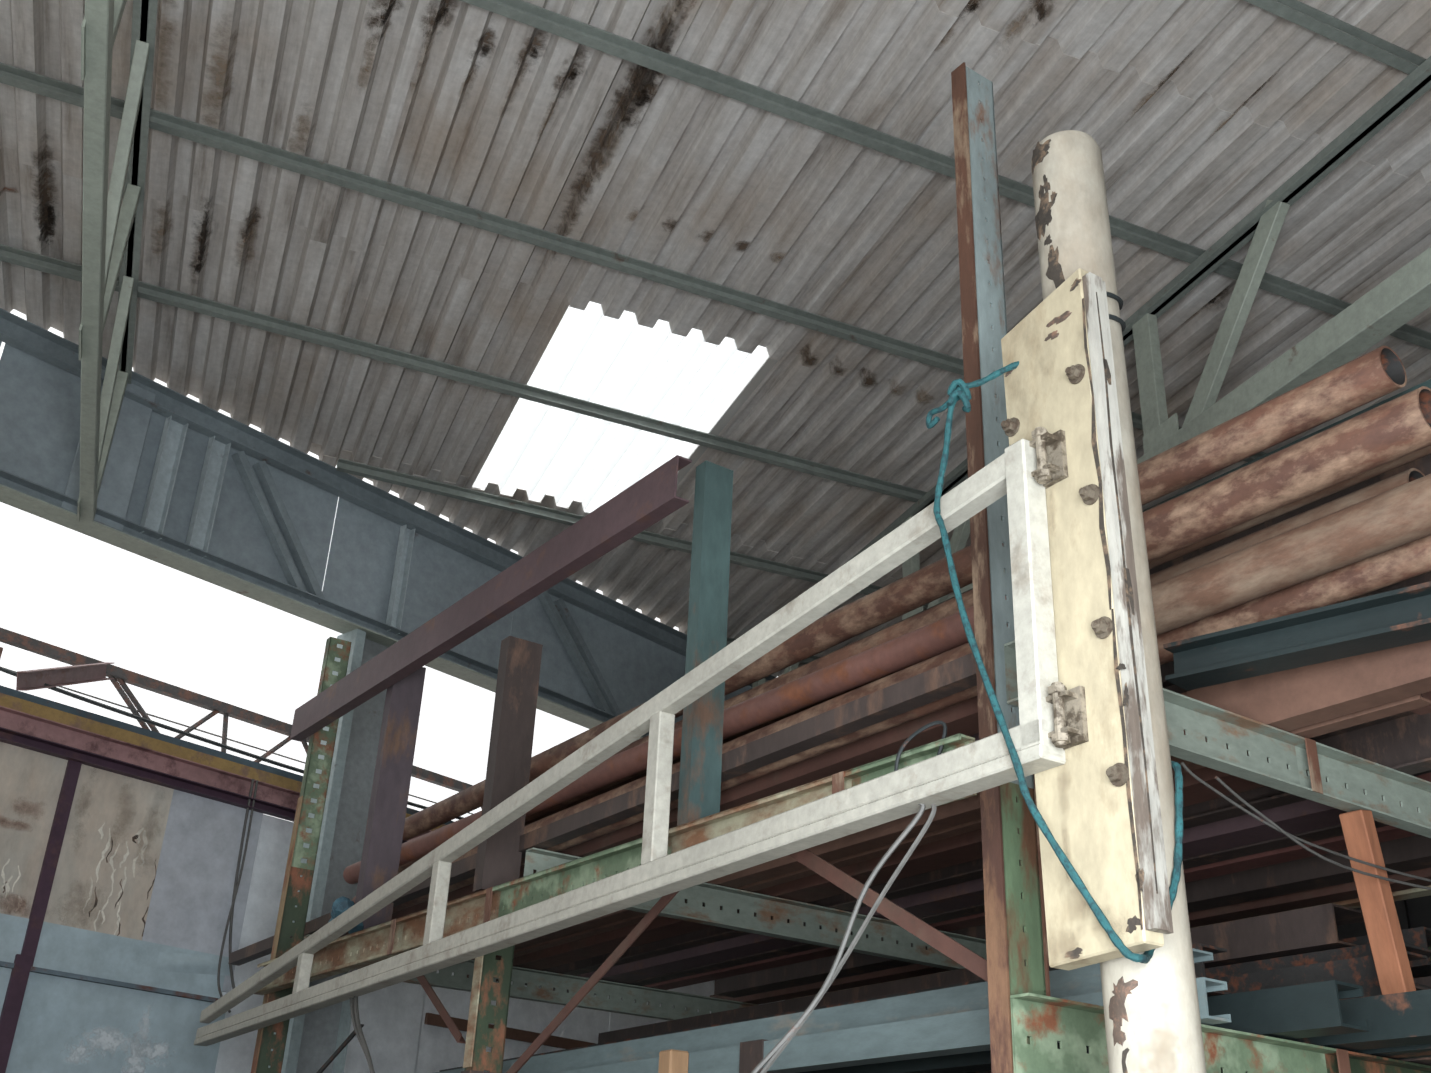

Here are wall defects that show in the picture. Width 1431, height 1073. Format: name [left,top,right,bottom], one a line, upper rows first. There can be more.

water stain [647,0,693,54]
water stain [554,48,585,90]
water stain [562,64,663,236]
water stain [34,146,56,241]
peeling [1032,139,1081,291]
peeling [1044,311,1072,341]
peeling [1109,976,1138,1046]